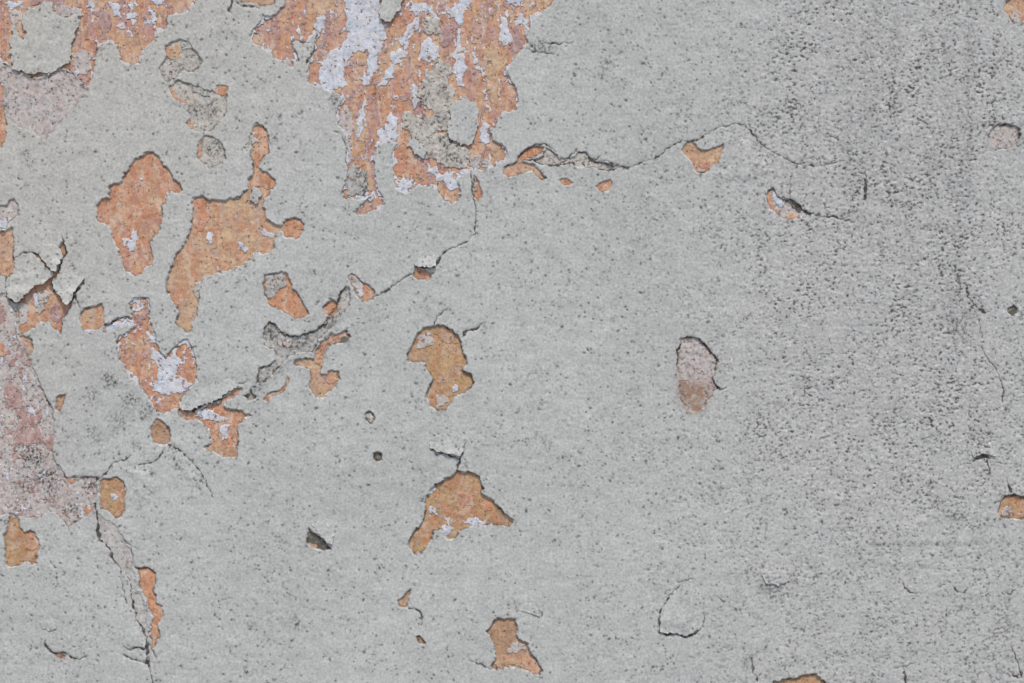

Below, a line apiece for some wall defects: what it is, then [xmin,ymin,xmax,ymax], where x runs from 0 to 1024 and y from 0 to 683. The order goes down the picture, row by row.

peeling [0,0,195,147]
peeling [241,0,614,216]
peeling [682,141,723,174]
crack [376,123,836,296]
crack [785,191,846,221]
peeling [0,123,375,567]
peeling [407,325,475,411]
peeling [409,470,513,555]
peeling [998,494,1024,519]
crack [63,446,211,683]
peeling [129,554,163,648]
peeling [486,618,543,675]